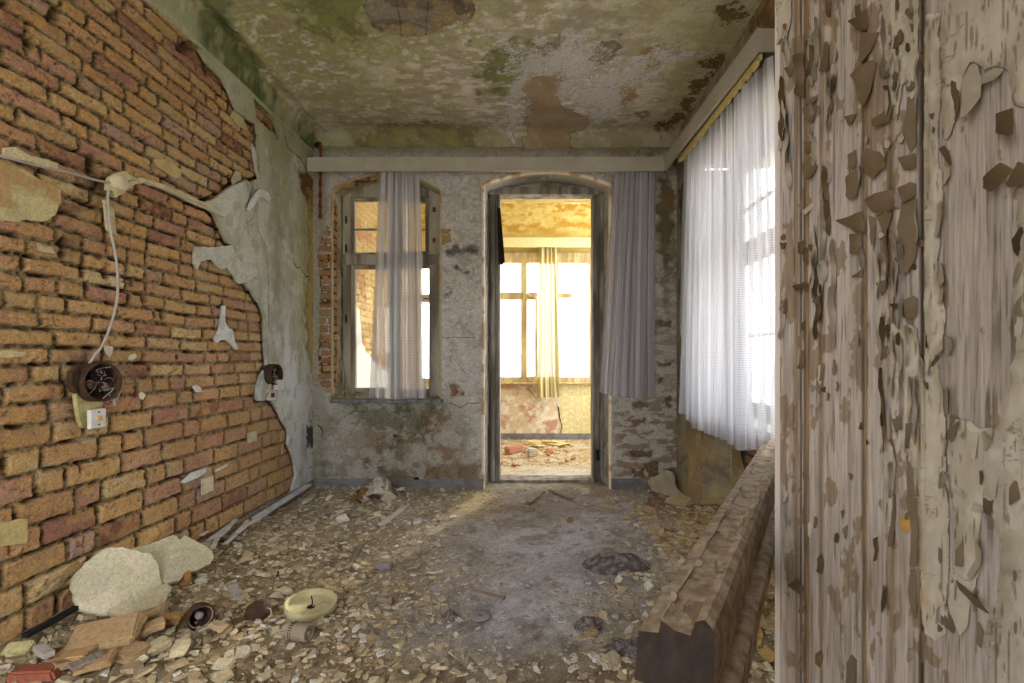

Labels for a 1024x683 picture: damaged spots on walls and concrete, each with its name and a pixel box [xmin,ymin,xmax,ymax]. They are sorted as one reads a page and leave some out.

damp [196,0,277,115]
damp [284,0,375,42]
damp [355,121,478,149]
spalling [361,0,476,37]
damp [473,37,535,96]
peeling [489,28,725,149]
peeling [712,1,749,28]
spalling [0,0,294,646]
spalling [317,199,340,393]
peeling [775,0,1024,683]